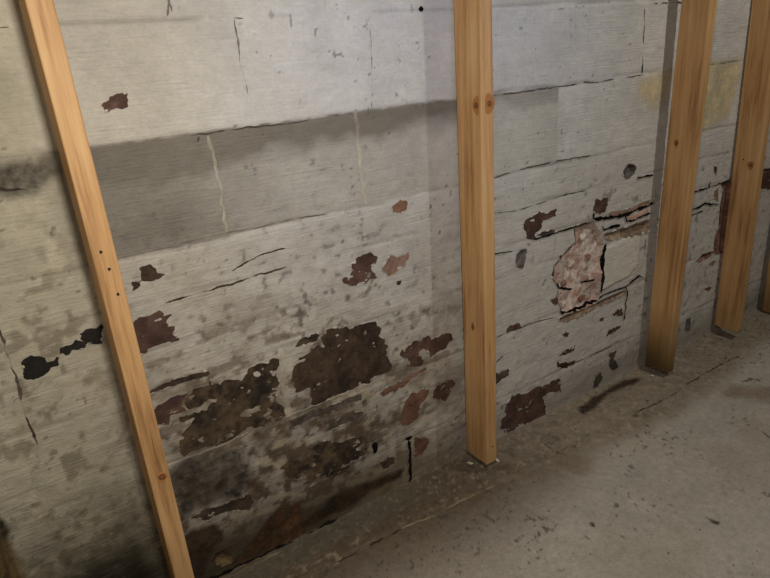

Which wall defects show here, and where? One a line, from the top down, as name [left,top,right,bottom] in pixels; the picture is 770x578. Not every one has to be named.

peeling [102,93,128,114]
peeling [761,169,770,190]
peeling [343,252,409,286]
peeling [21,324,105,380]
peeling [133,310,179,357]
peeling [380,333,453,396]
spalling [500,196,651,434]
peeling [150,322,392,482]
peeling [400,380,455,426]
peeling [380,457,396,469]
water stain [185,525,222,578]